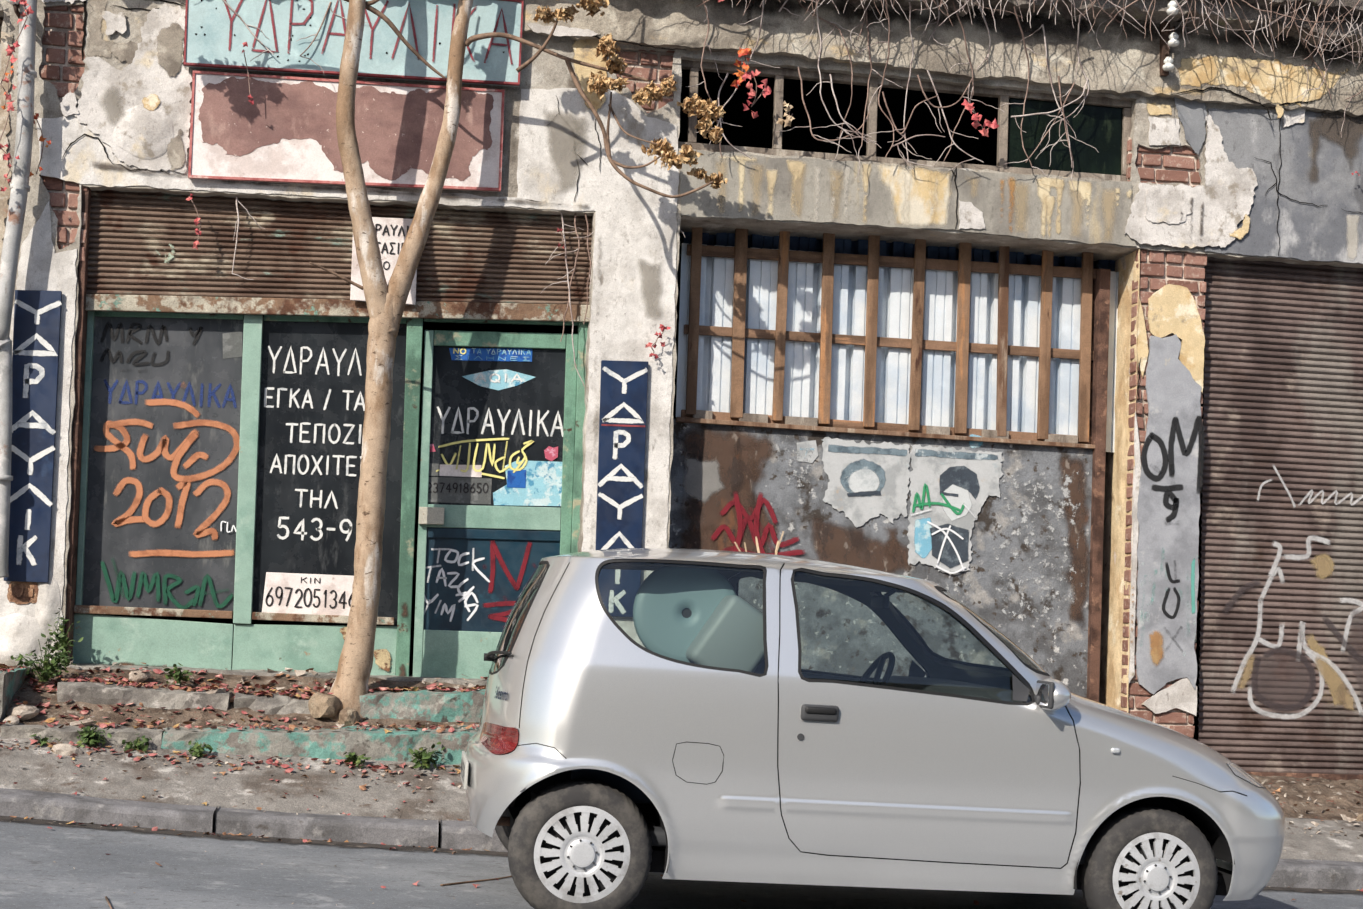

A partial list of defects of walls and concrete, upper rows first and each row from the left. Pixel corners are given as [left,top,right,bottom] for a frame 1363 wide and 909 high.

flaking render [39,0,192,174]
crack [81,0,186,61]
flaking render [527,23,675,113]
flaking render [40,176,88,261]
crack [62,133,167,173]
damp [720,156,950,226]
damp [1017,178,1132,236]
flaking render [1125,55,1349,249]
crack [1170,87,1363,256]
flaking render [1128,284,1205,716]